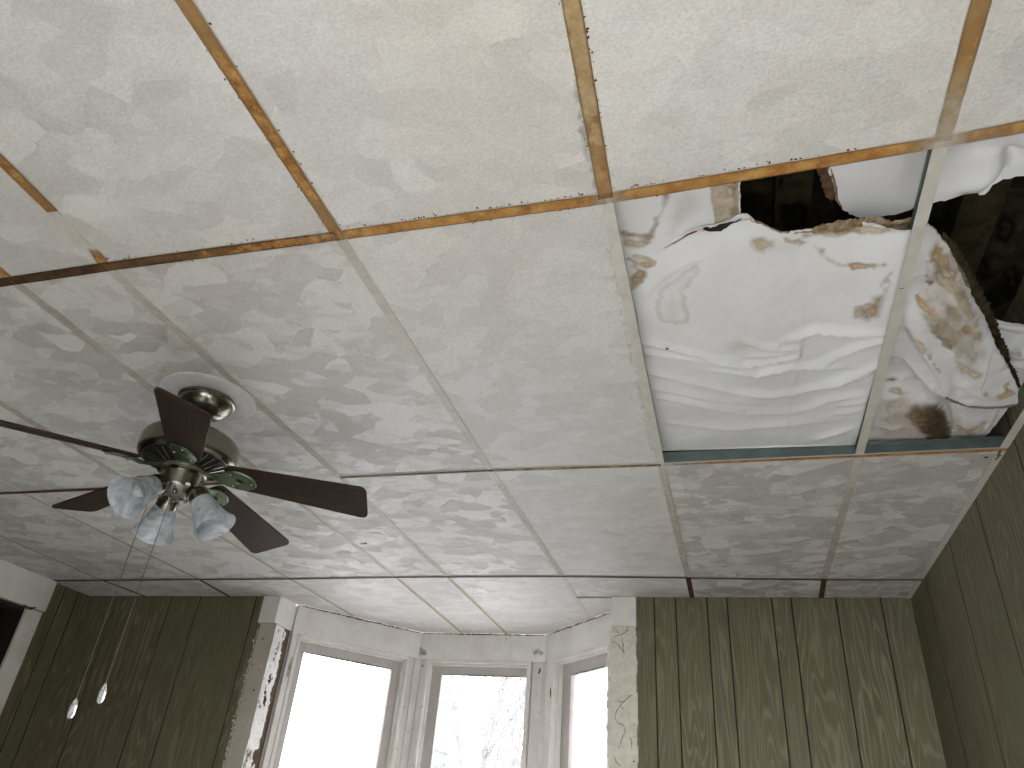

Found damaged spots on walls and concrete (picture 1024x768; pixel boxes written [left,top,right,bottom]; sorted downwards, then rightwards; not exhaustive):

corrosion [0,0,992,287]
corrosion [967,121,1024,143]
leakage [622,224,657,288]
leakage [754,239,771,250]
leakage [855,298,880,318]
leakage [917,246,980,378]
leakage [887,379,959,439]
peeling [242,624,286,768]